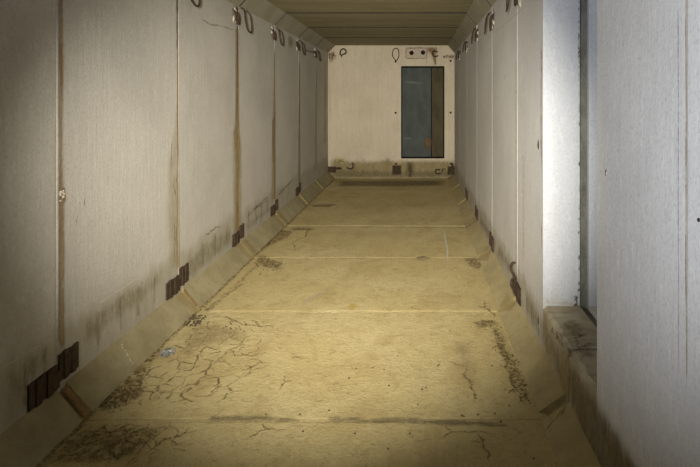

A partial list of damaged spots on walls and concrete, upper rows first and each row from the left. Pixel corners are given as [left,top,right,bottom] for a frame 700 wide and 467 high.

leakage [334,161,451,186]
leakage [219,186,336,291]
leakage [35,300,221,467]
crack [120,316,273,405]